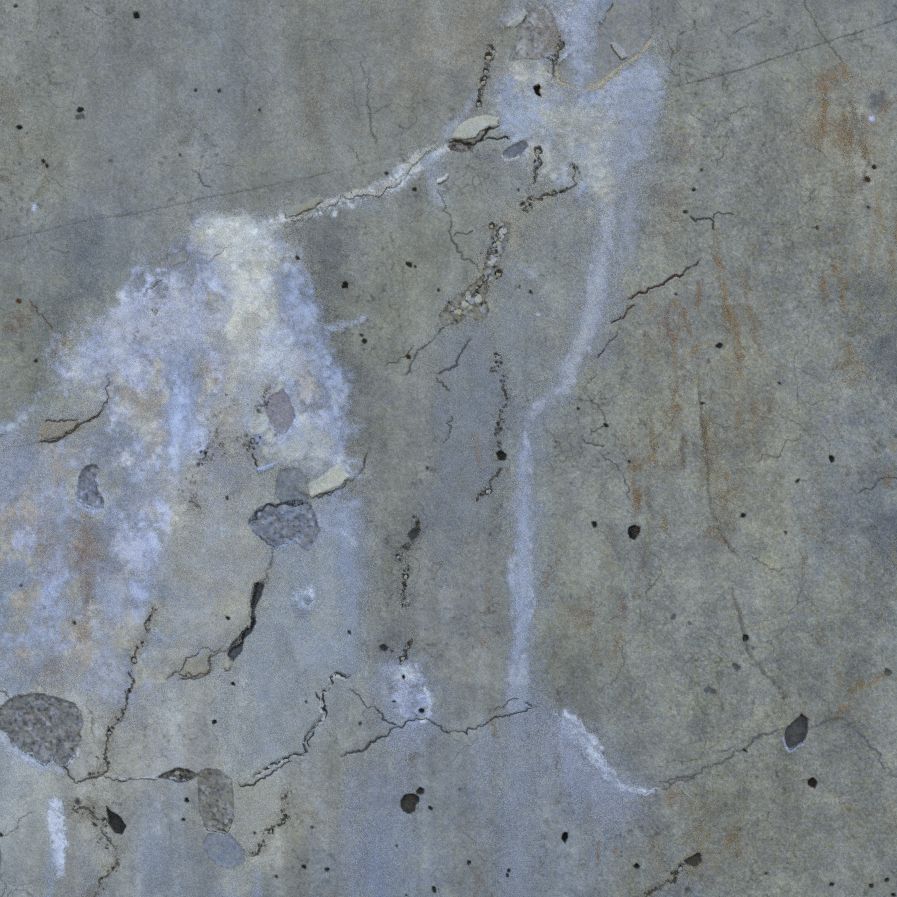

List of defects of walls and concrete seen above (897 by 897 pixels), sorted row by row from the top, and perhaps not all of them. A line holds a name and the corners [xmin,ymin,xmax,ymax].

crack [288,127,509,219]
crack [518,147,578,212]
crack [385,222,504,372]
leakage [0,93,478,775]
leakage [435,317,509,525]
leakage [450,0,670,727]
spalling [248,461,350,550]
crack [168,581,262,678]
spalling [0,693,83,769]
crack [64,608,158,784]
crack [240,672,532,787]
spalling [158,768,244,868]